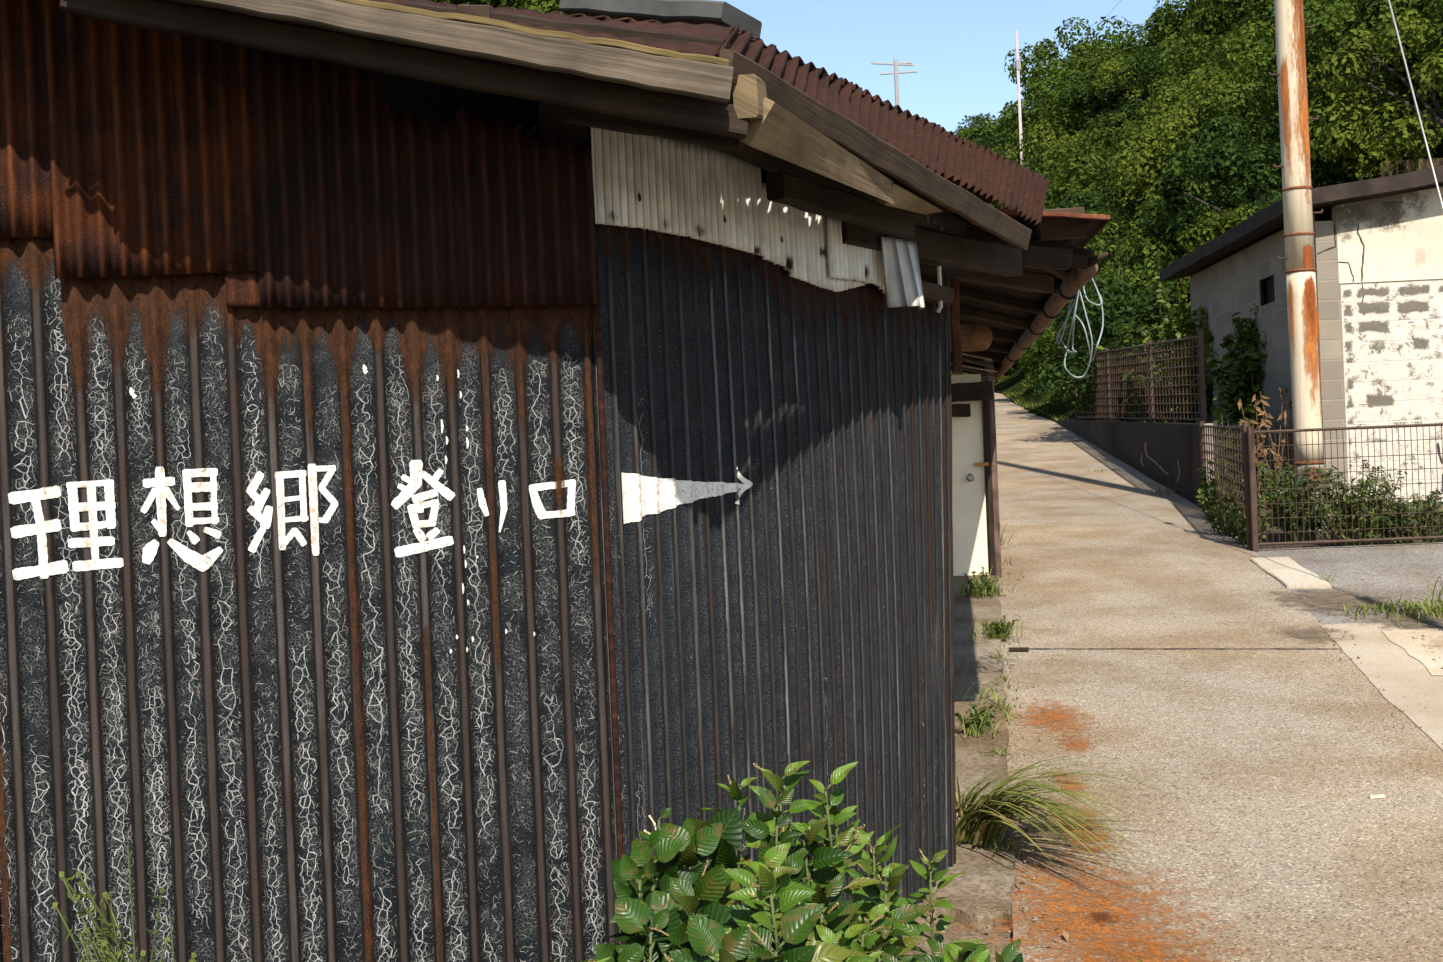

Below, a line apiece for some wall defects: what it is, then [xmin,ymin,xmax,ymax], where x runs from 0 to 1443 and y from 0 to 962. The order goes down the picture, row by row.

corrosion [1280,0,1310,202]
corrosion [1288,244,1323,419]
crack [1317,222,1365,316]
water stain [1331,190,1422,238]
peeling [1343,284,1443,444]